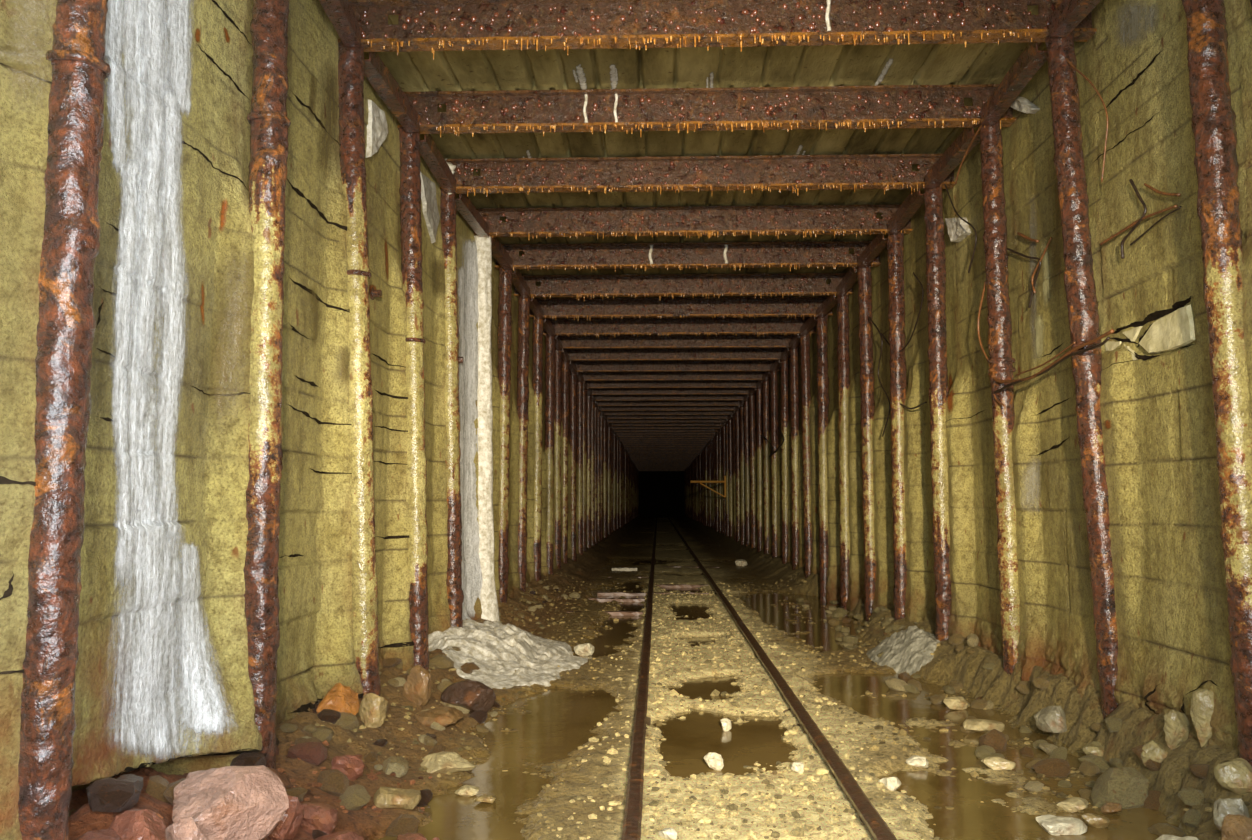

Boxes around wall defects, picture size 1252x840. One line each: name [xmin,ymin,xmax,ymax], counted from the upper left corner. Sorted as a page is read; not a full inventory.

corrosion [361,0,970,60]
crack [195,33,248,98]
corrosion [412,92,987,138]
crack [287,179,347,231]
corrosion [457,159,929,197]
corrosion [476,210,905,339]
leakage [211,262,254,406]
leakage [105,0,225,756]
crack [0,476,36,486]
leakage [428,236,588,689]
crack [0,572,14,600]
leakage [866,625,940,676]